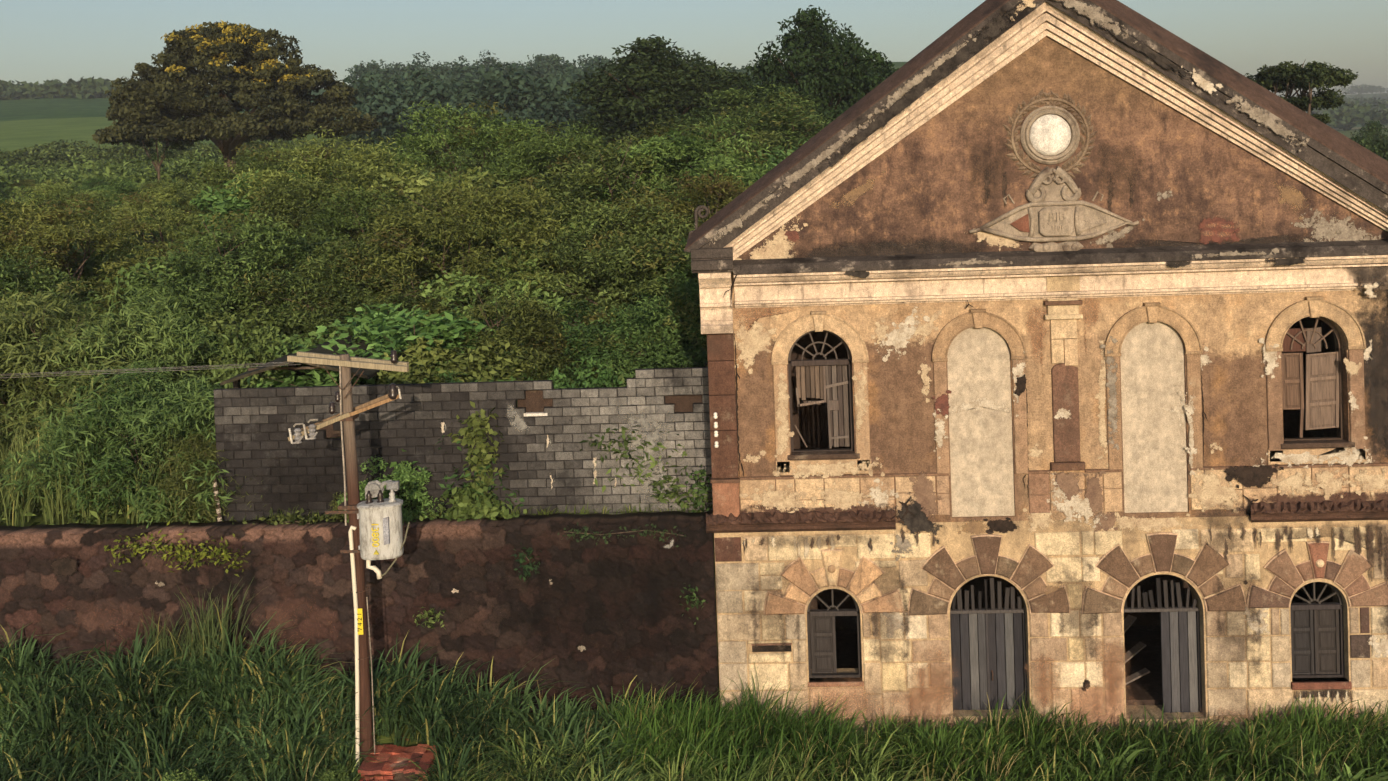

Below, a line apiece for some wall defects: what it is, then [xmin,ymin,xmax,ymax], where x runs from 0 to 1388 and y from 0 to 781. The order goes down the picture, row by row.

peeling [1010,0,1036,21]
peeling [1056,0,1140,46]
peeling [1181,66,1309,152]
peeling [734,318,777,374]
peeling [852,306,1027,459]
peeling [739,368,942,519]
peeling [958,336,1388,535]
water stain [886,492,947,546]
water stain [1206,521,1388,587]